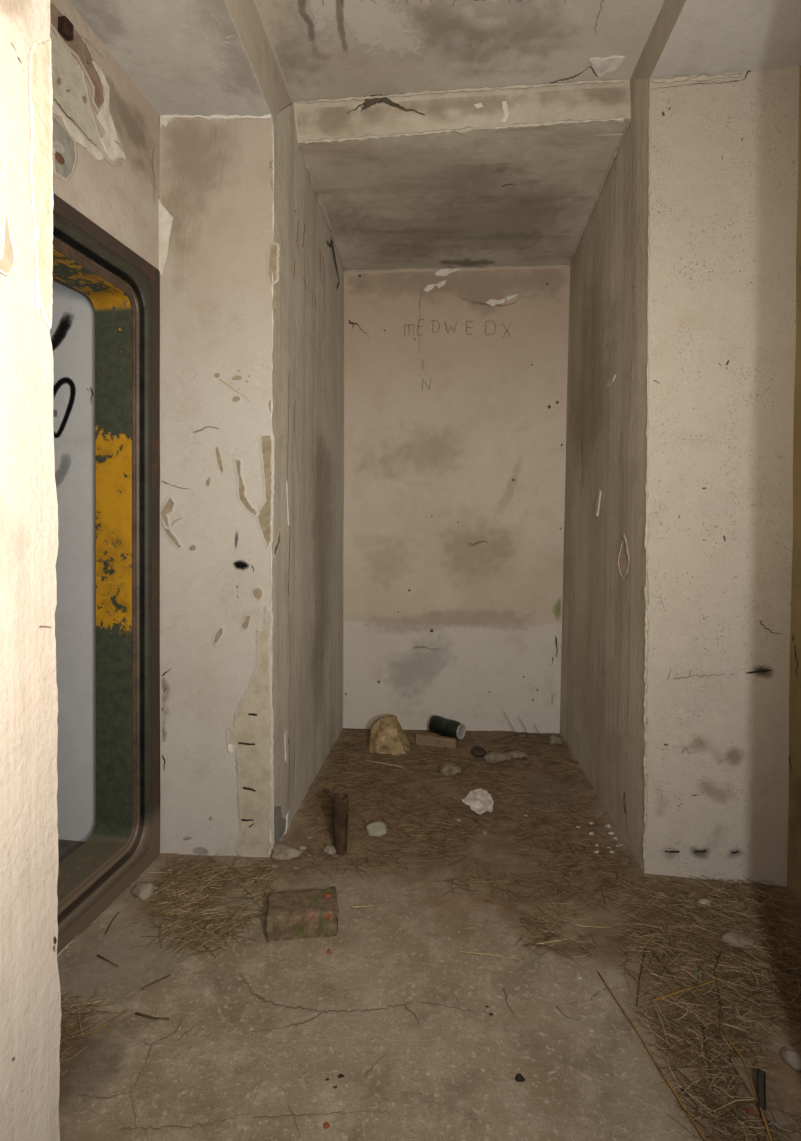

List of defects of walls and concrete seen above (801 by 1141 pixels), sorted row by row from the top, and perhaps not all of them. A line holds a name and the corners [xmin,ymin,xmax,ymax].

peeling [0,159,15,275]
peeling [29,0,126,329]
peeling [424,269,462,292]
peeling [486,294,518,306]
peeling [160,494,196,551]
peeling [206,433,281,558]
flaking render [226,585,291,858]
crack [241,975,516,1034]
crack [78,1018,392,1135]